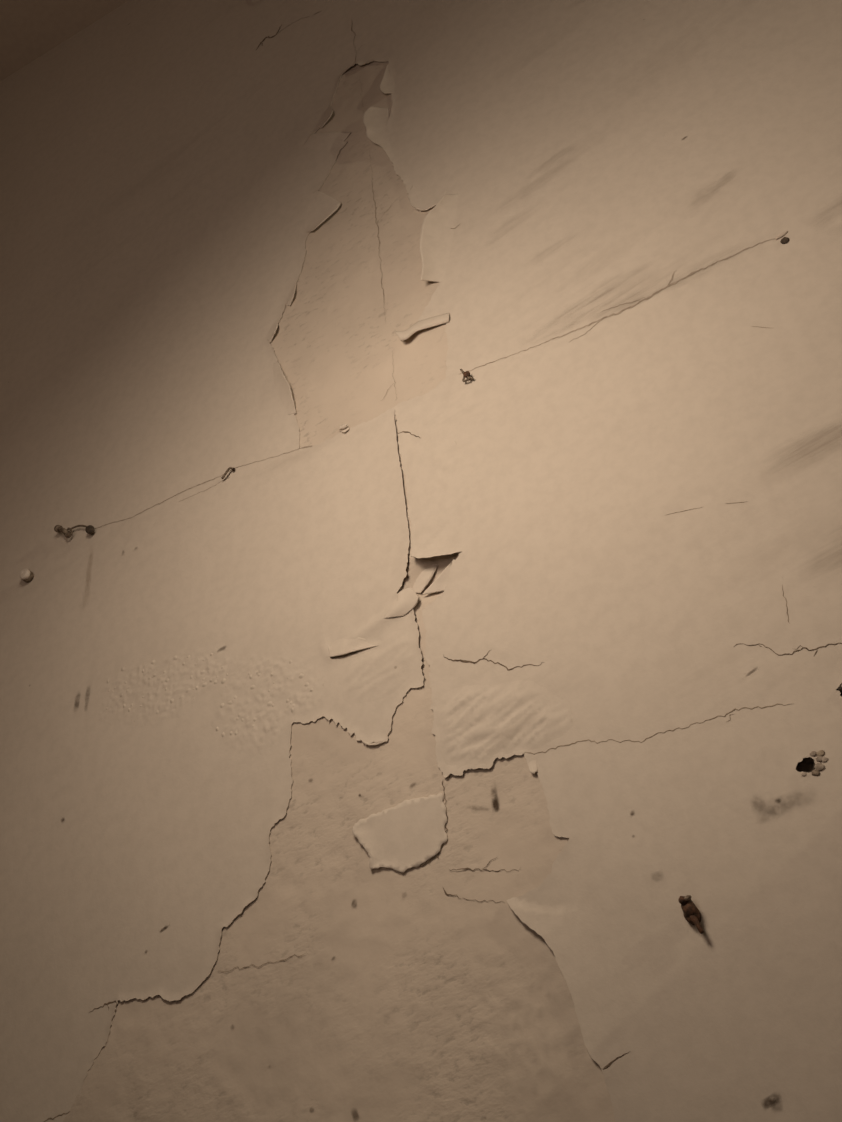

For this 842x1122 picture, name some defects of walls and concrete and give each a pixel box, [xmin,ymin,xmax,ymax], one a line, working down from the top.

peeling [267,61,458,448]
crack [460,239,772,374]
crack [94,445,312,529]
peeling [384,562,452,618]
crack [443,651,545,671]
crack [524,703,788,754]
peeling [63,681,615,1122]